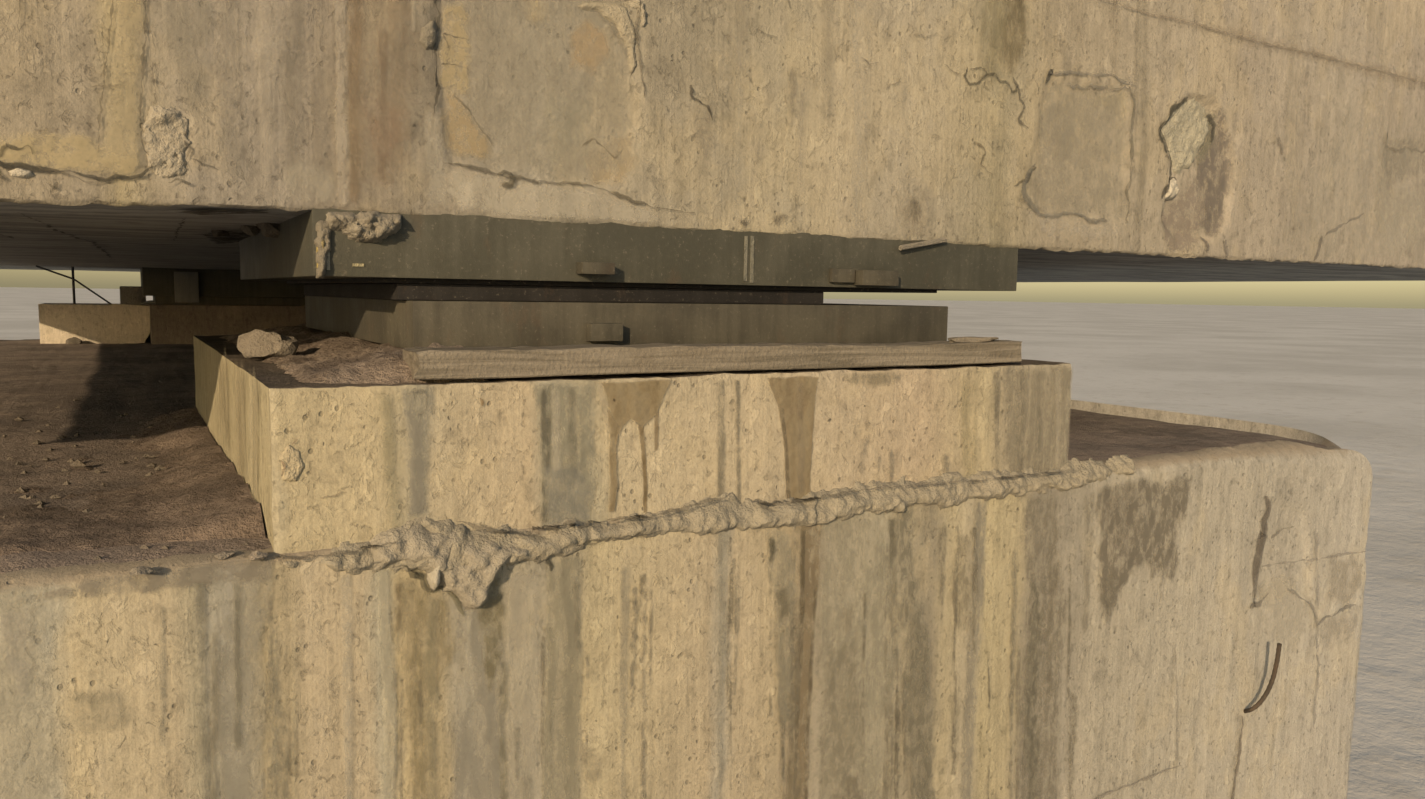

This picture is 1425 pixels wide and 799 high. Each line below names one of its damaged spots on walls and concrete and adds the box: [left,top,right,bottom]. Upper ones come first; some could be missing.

crack [0,1,151,190]
peeling [419,0,695,213]
crack [964,67,1028,128]
spalling [1159,97,1231,256]
water stain [535,380,671,524]
water stain [768,376,818,499]
water stain [769,509,935,799]
water stain [939,503,990,799]
water stain [1010,478,1189,799]